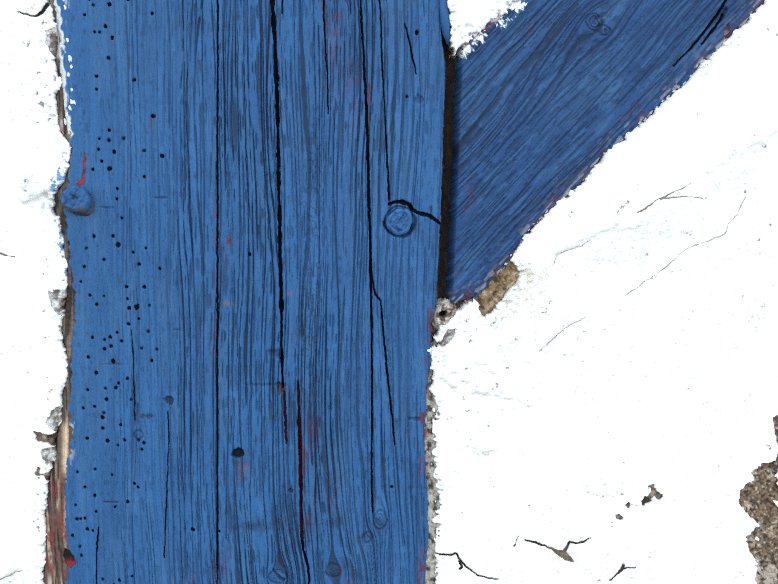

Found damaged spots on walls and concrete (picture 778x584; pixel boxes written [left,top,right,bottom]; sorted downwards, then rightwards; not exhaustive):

crack [674,0,727,66]
crack [271,0,310,584]
crack [360,0,440,512]
spalling [465,250,520,316]
crack [436,553,498,580]
crack [514,536,590,562]
crack [609,564,636,581]
spalling [641,484,663,505]
spalling [739,454,778,584]